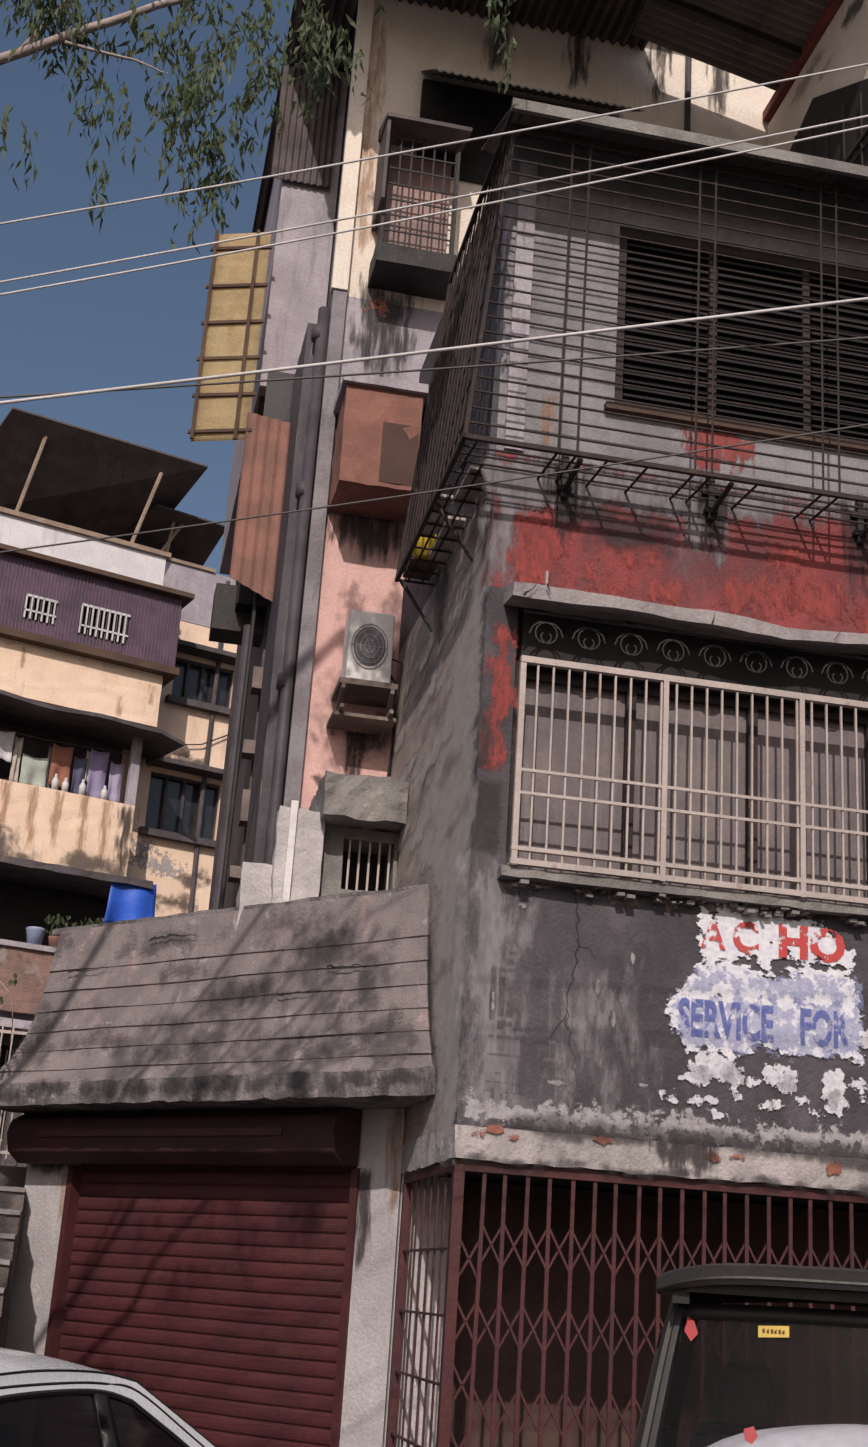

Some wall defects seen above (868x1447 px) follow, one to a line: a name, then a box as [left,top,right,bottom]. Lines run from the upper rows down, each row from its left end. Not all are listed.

water stain [647,45,672,102]
water stain [707,66,729,114]
water stain [350,280,415,377]
water stain [325,514,402,558]
peeling [506,503,569,585]
peeling [583,548,689,607]
peeling [719,538,868,634]
water stain [66,807,135,876]
water stain [455,719,868,1173]
crack [539,889,598,1115]
spalling [471,1124,519,1159]
spalling [827,1161,842,1192]